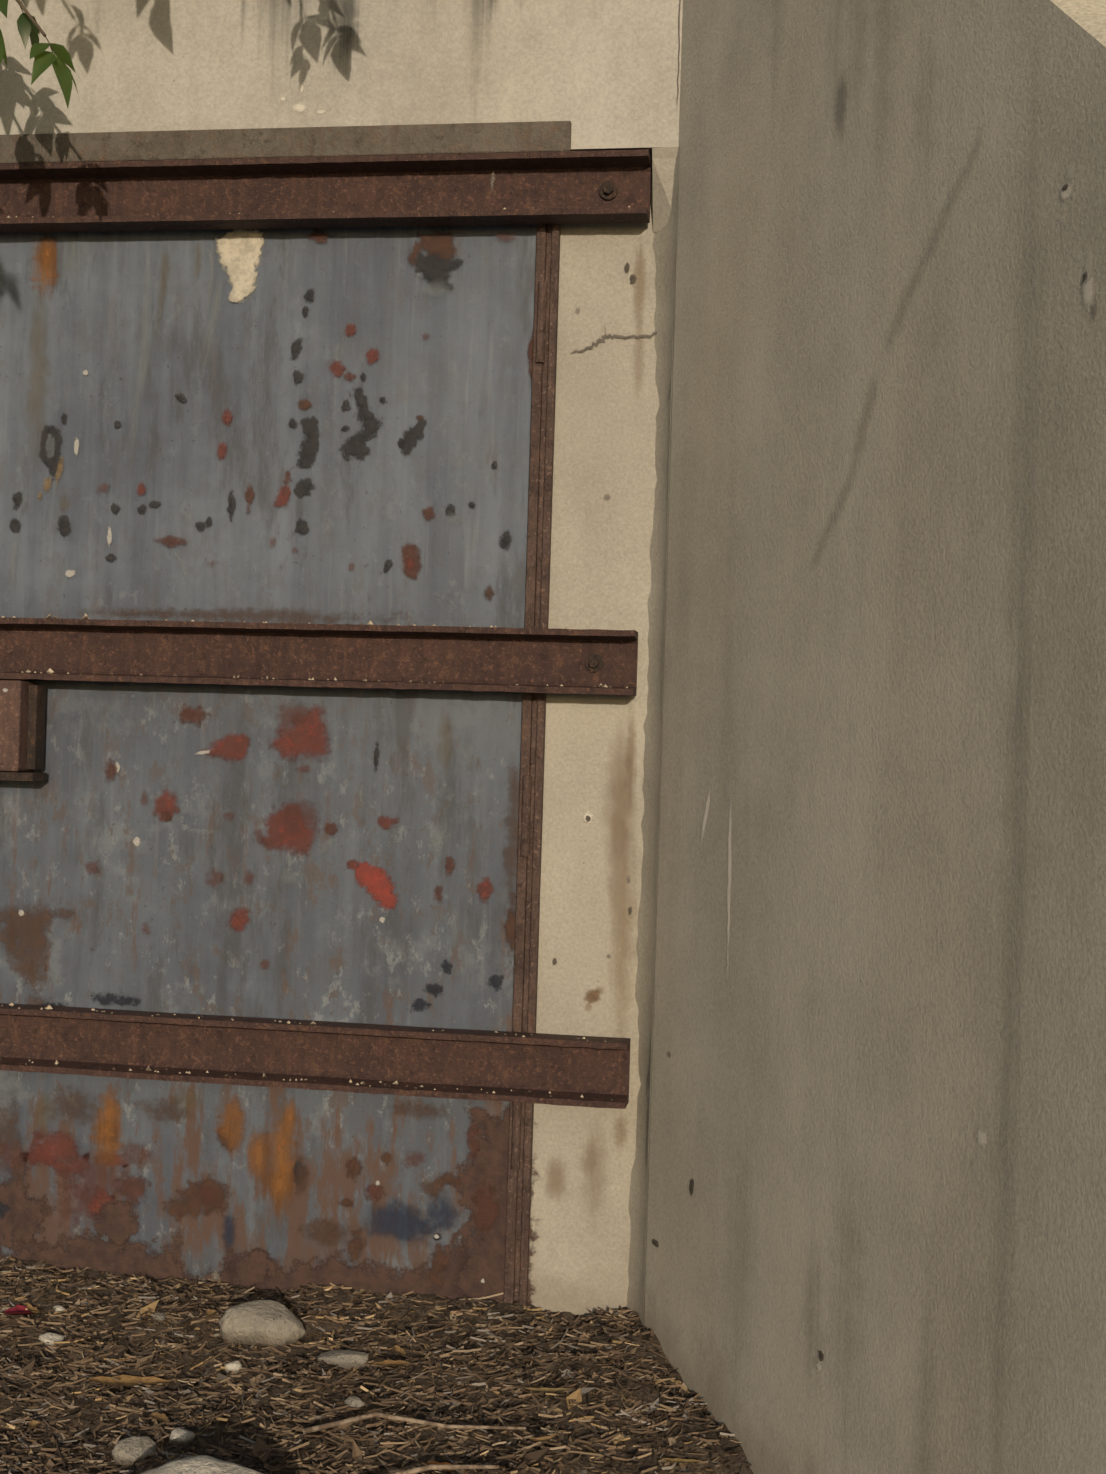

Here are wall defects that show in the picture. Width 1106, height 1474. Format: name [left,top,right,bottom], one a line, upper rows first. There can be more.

crack [675,0,683,101]
peeling [215,229,264,302]
crack [572,332,657,353]
peeling [288,338,319,498]
peeling [339,373,385,460]
peeling [398,415,427,455]
peeling [9,413,79,533]
corrosion [180,706,206,724]
corrosion [208,734,249,761]
corrosion [270,707,331,761]
corrosion [477,878,494,900]
corrosion [0,1094,538,1305]